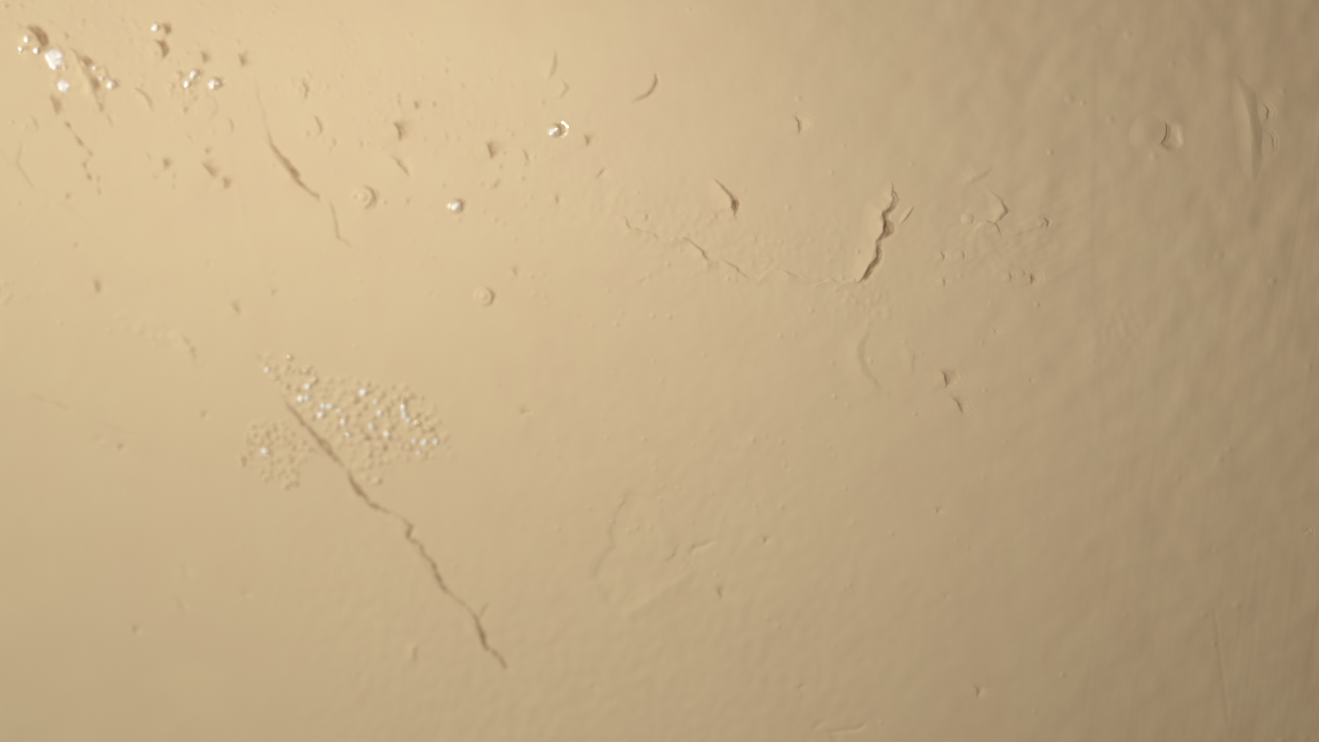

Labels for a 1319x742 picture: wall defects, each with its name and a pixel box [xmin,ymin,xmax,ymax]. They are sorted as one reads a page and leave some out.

crack [255,77,361,253]
crack [282,394,511,673]